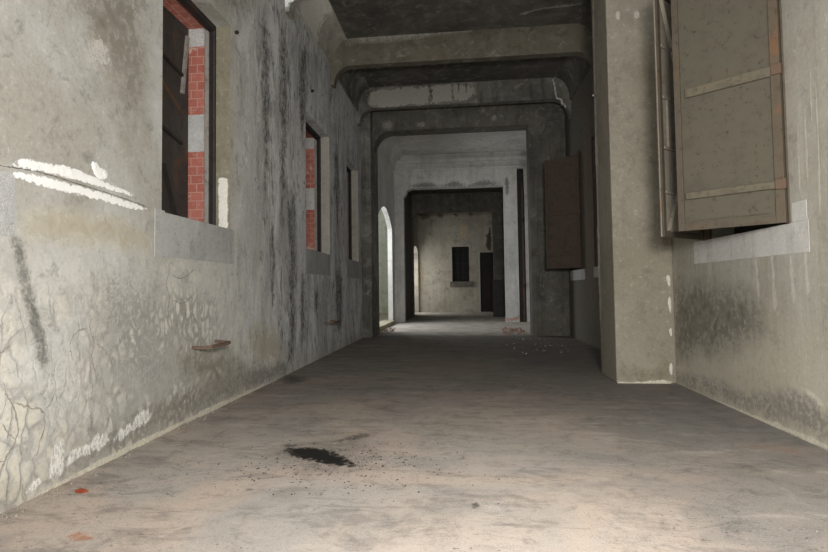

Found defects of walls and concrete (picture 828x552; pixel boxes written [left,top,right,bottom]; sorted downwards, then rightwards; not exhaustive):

flaking render [285,0,333,42]
leakage [12,237,48,367]
crack [70,319,114,378]
leakage [26,198,304,494]
leakage [675,259,762,355]
crack [0,383,55,472]
leakage [685,377,828,449]